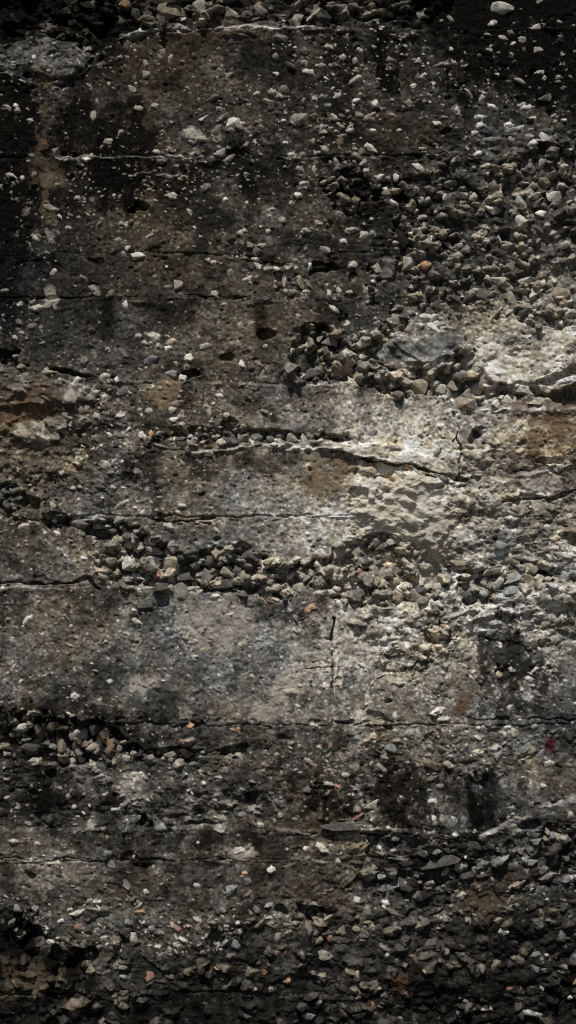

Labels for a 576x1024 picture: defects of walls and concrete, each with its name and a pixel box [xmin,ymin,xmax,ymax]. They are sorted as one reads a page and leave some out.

spalling [283,113,576,405]
crack [359,411,469,483]
crack [151,515,217,526]
spalling [42,483,576,623]
spalling [0,706,297,833]
spalling [0,823,576,1024]